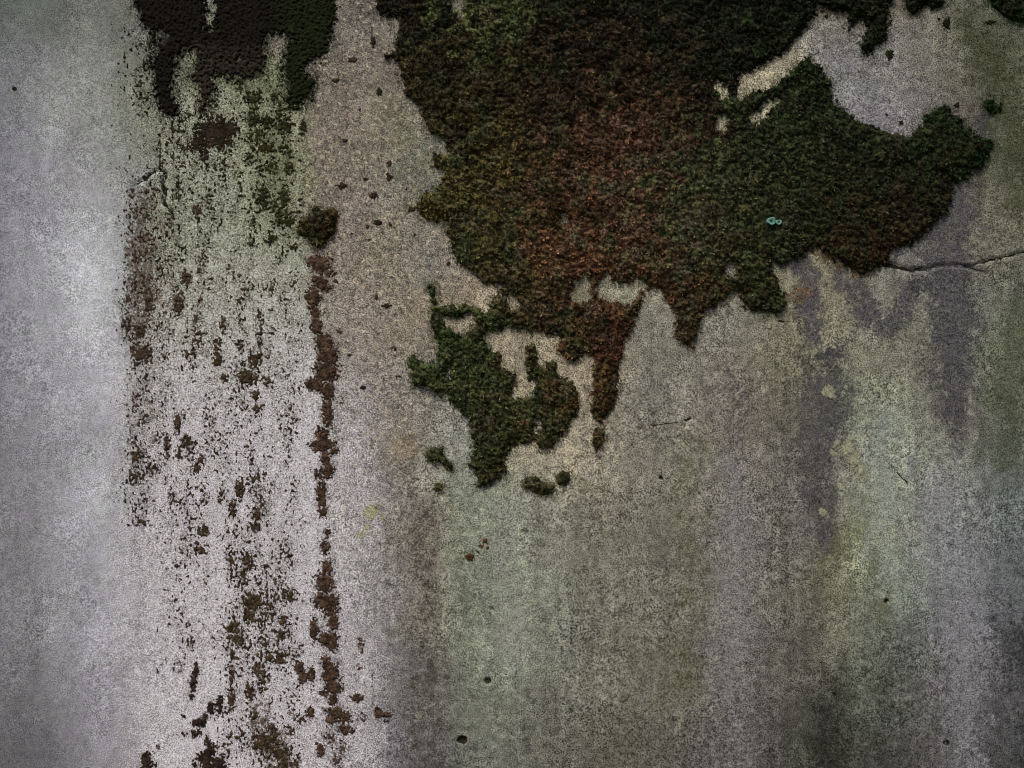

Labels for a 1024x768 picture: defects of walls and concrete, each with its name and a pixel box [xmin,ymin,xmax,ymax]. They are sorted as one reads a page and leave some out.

water stain [101,82,392,768]
water stain [781,180,1024,768]
crack [882,251,1024,272]